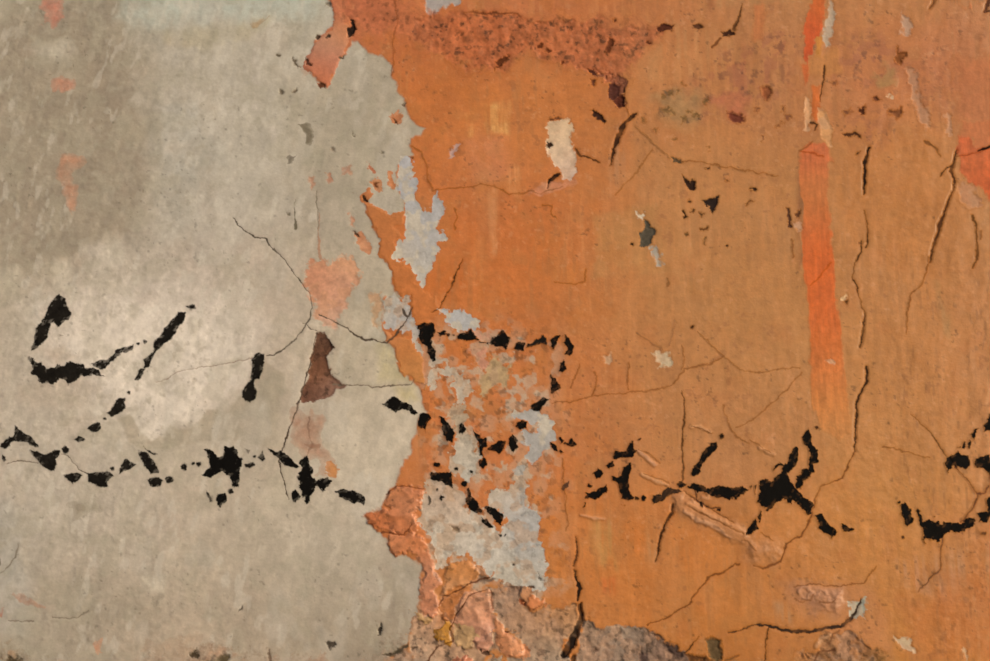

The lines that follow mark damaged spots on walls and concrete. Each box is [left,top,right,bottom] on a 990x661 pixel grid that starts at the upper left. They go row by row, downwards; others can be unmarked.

flaking render [302,0,675,110]
peeling [527,116,579,200]
flaking render [589,108,607,125]
crack [905,140,990,335]
crack [155,217,463,500]
peeling [299,155,770,661]
crack [551,318,803,563]
crack [646,146,872,627]
flaking render [133,637,338,661]
crack [560,457,585,661]
crack [727,565,877,661]
flaking render [790,595,918,661]